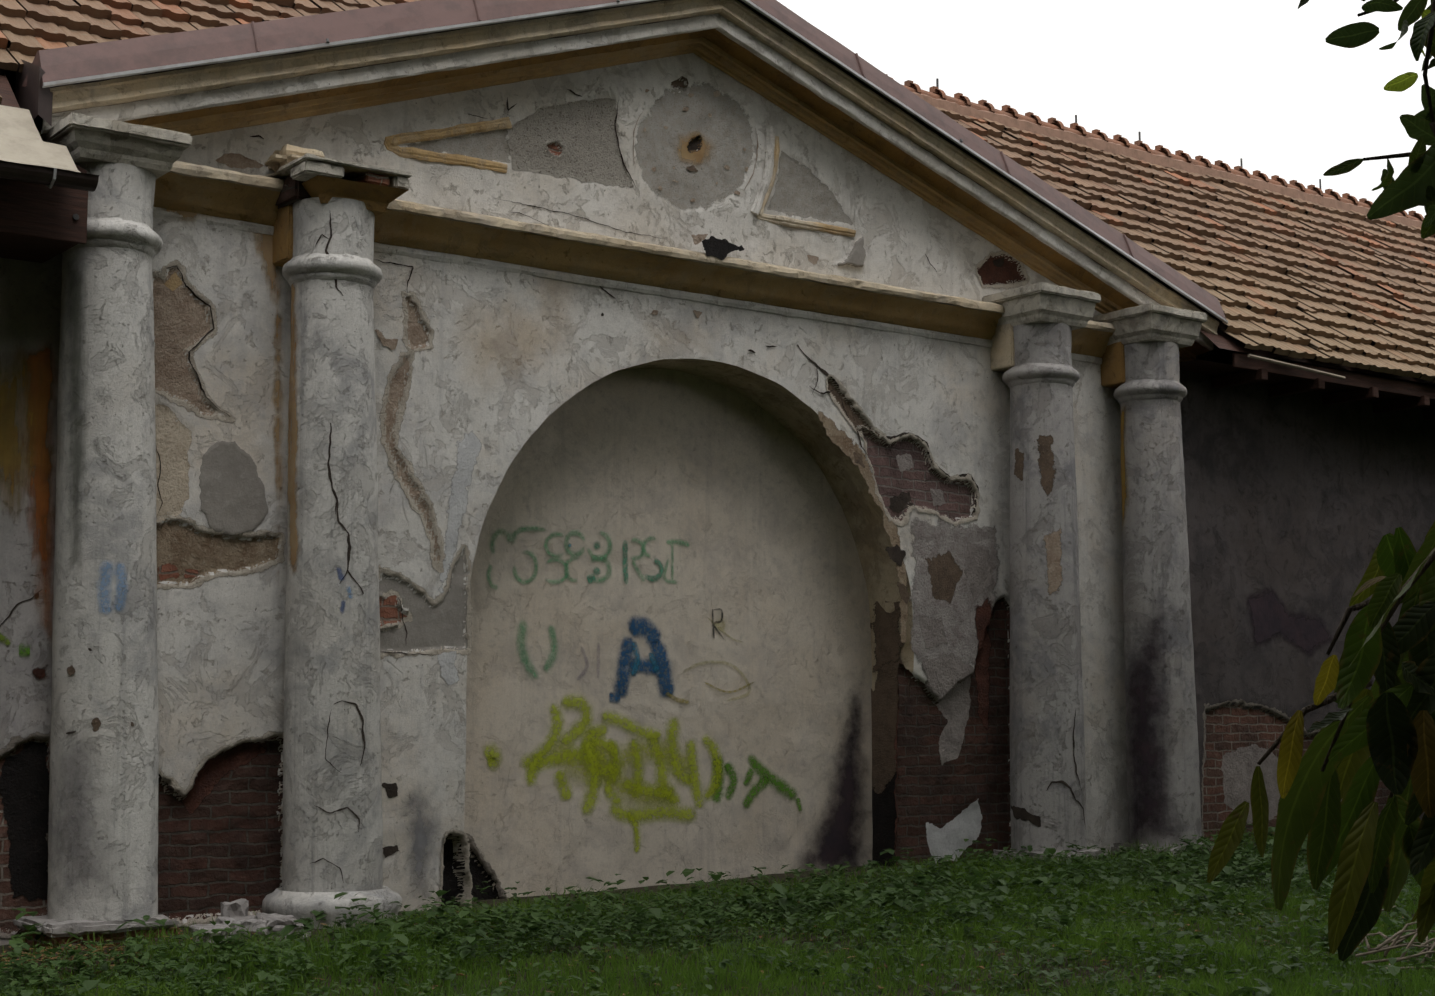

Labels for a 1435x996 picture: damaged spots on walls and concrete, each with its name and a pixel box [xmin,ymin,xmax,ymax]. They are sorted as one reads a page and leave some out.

flaking render [152,260,286,590]
crack [327,423,364,594]
spalling [375,260,474,660]
crack [797,345,979,513]
spalling [0,731,76,939]
crack [32,664,48,680]
spalling [158,731,284,927]
crack [316,806,360,832]
crack [325,700,366,773]
damp [805,705,861,870]
spalling [818,411,1011,869]
spalling [1201,698,1321,842]